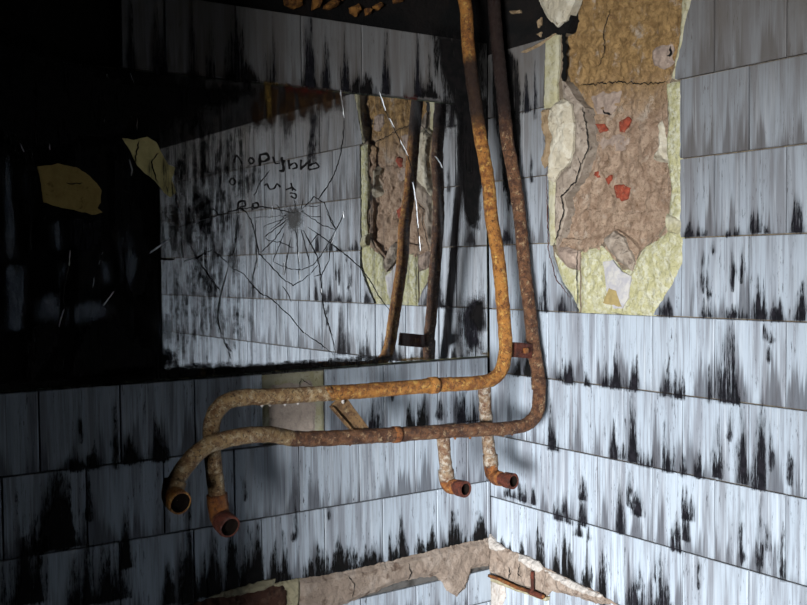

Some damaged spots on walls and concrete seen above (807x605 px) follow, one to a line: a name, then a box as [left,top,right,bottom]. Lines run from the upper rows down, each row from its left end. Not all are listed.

flaking render [522,0,691,316]
leakage [556,352,639,392]
leakage [659,361,685,401]
leakage [706,278,806,407]
leakage [548,406,559,451]
leakage [610,398,775,492]
spalling [189,534,617,605]
corrosion [488,574,550,601]
leakage [535,478,607,605]
leakage [616,484,642,535]
leakage [625,558,672,605]
leakage [670,489,695,554]